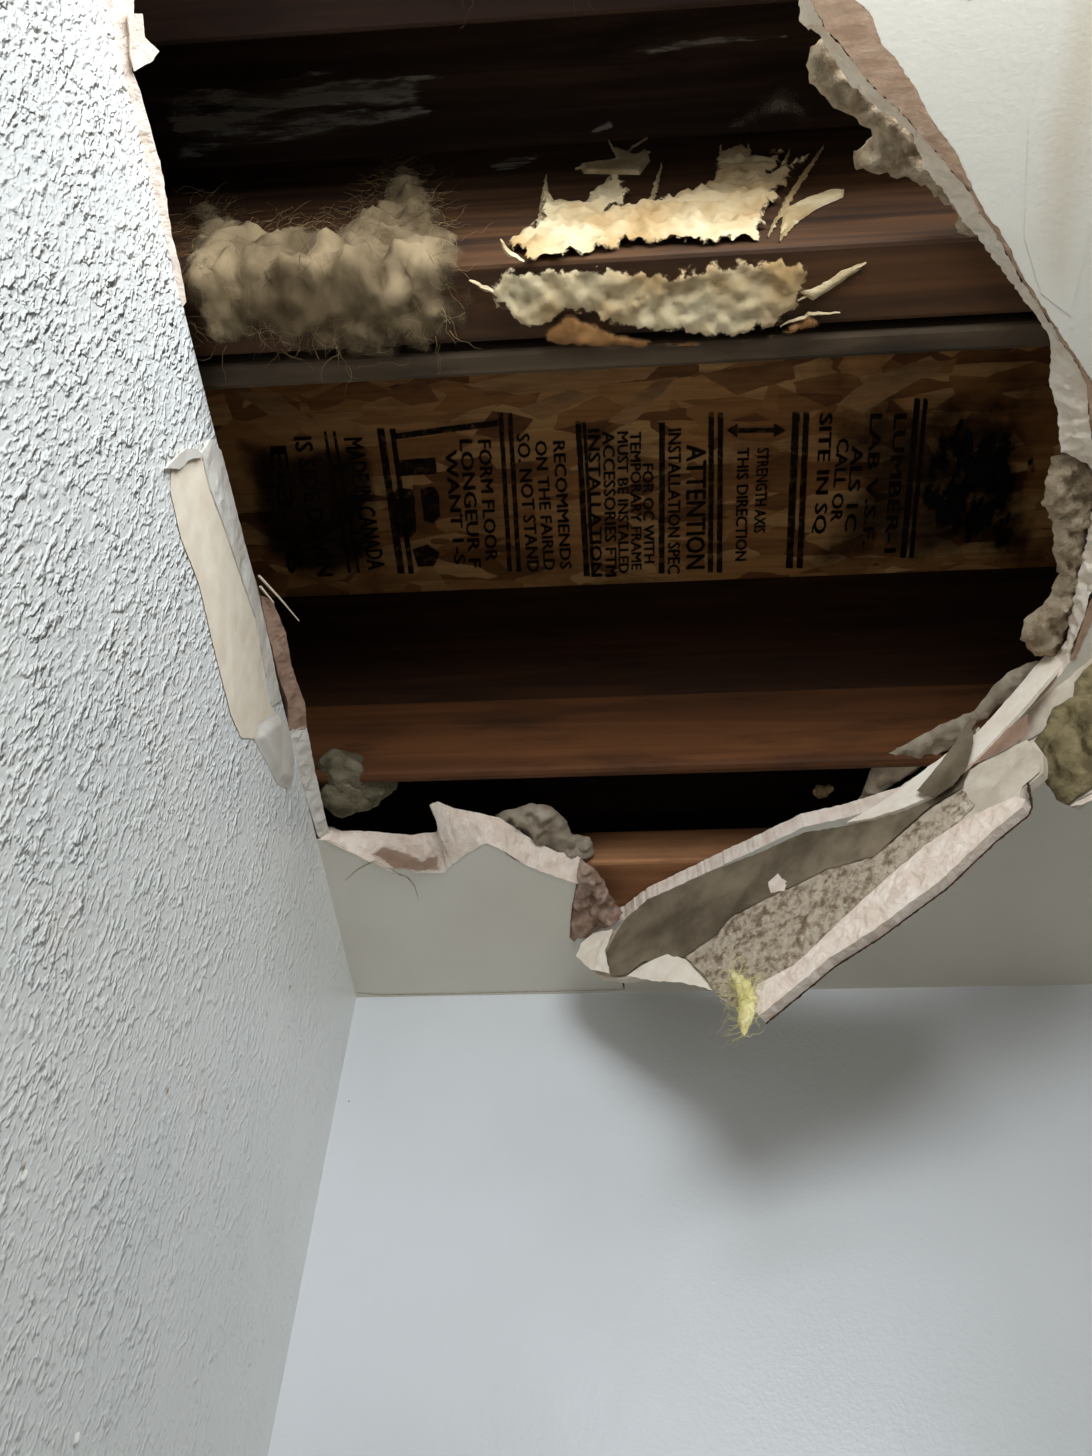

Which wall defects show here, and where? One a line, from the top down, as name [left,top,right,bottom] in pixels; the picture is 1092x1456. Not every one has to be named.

peeling [127,13,159,71]
spalling [798,0,1092,660]
peeling [165,439,294,789]
spalling [326,801,623,941]
peeling [768,874,787,894]